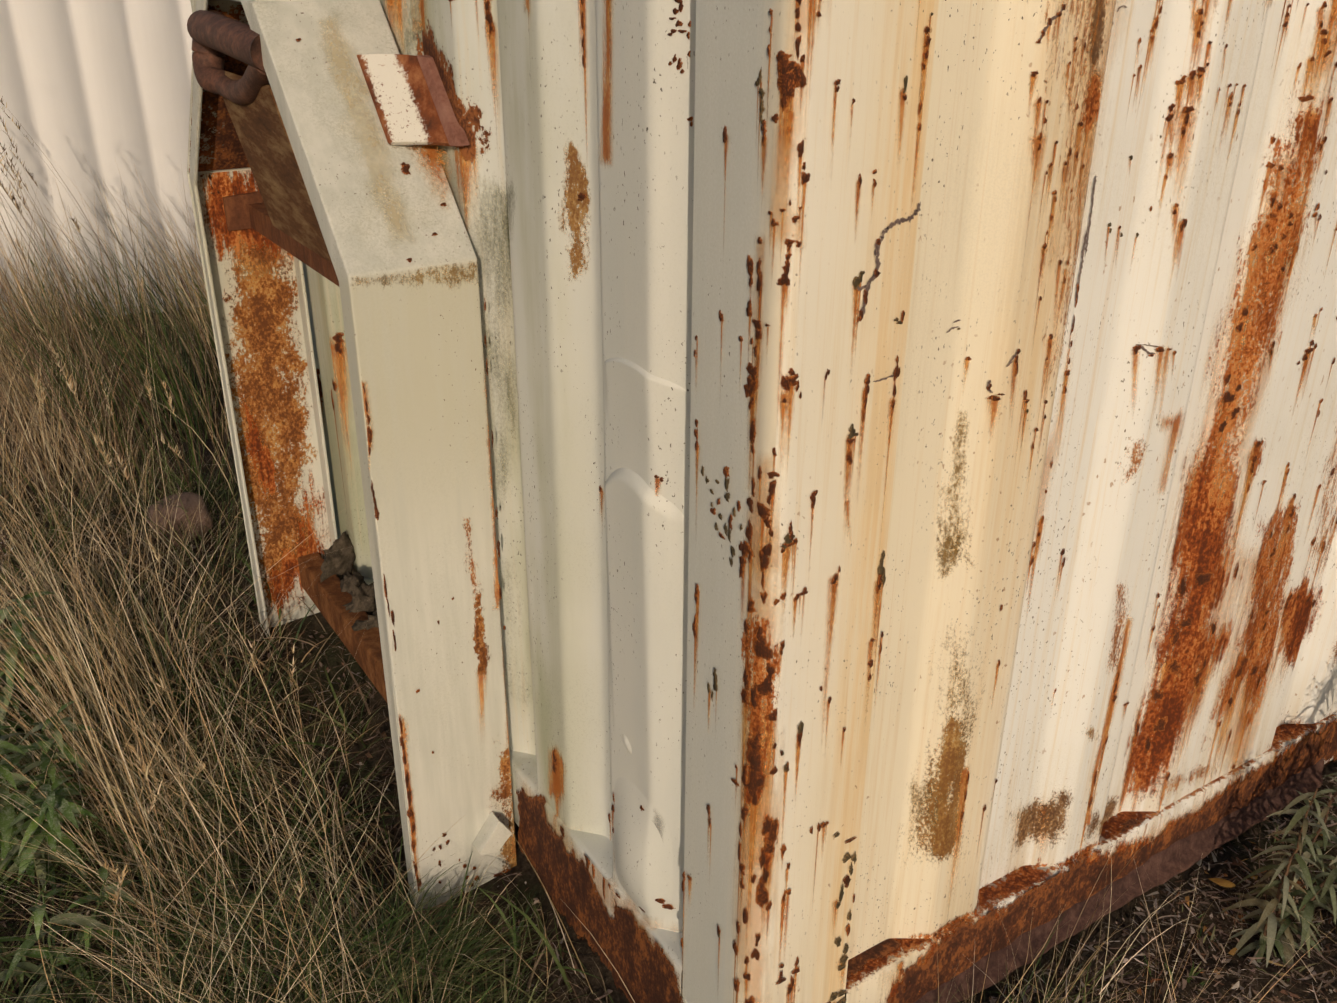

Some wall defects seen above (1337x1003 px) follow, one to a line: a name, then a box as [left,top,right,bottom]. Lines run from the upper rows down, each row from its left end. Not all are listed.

rust [832,79,855,137]
rust [558,142,590,278]
crack [857,202,921,322]
rust [189,89,349,622]
rust [362,382,372,456]
rust [383,574,397,651]
rust [464,430,502,715]
rust [717,0,822,1003]
rust [819,565,846,753]
rust [845,0,1337,1003]
rust [399,717,422,891]
rust [810,822,829,870]